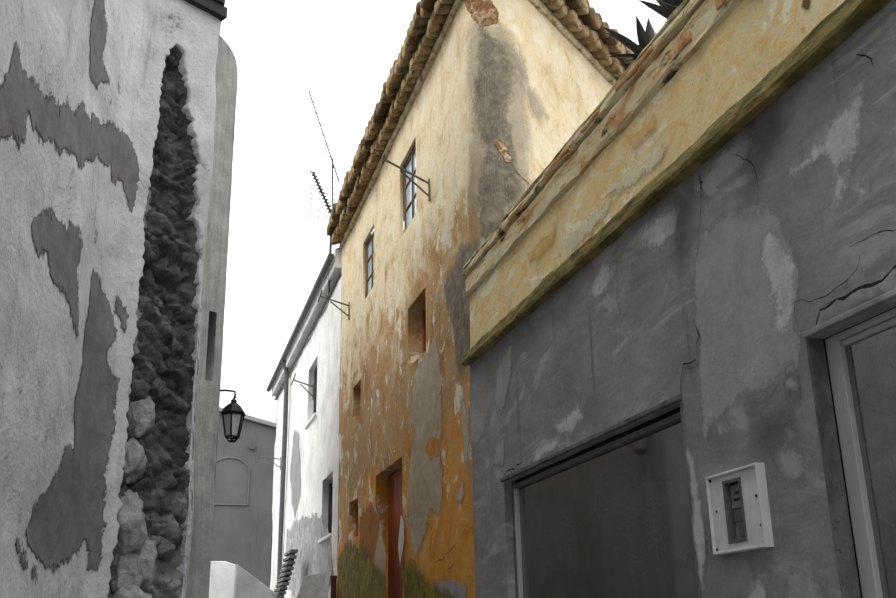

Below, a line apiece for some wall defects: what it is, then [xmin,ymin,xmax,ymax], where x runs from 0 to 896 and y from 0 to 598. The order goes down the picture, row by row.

peeling [89,0,110,89]
spalling [464,0,499,27]
damp [444,27,541,373]
spalling [0,32,209,598]
crack [680,325,702,394]
crack [794,229,896,325]
peeling [405,337,442,556]